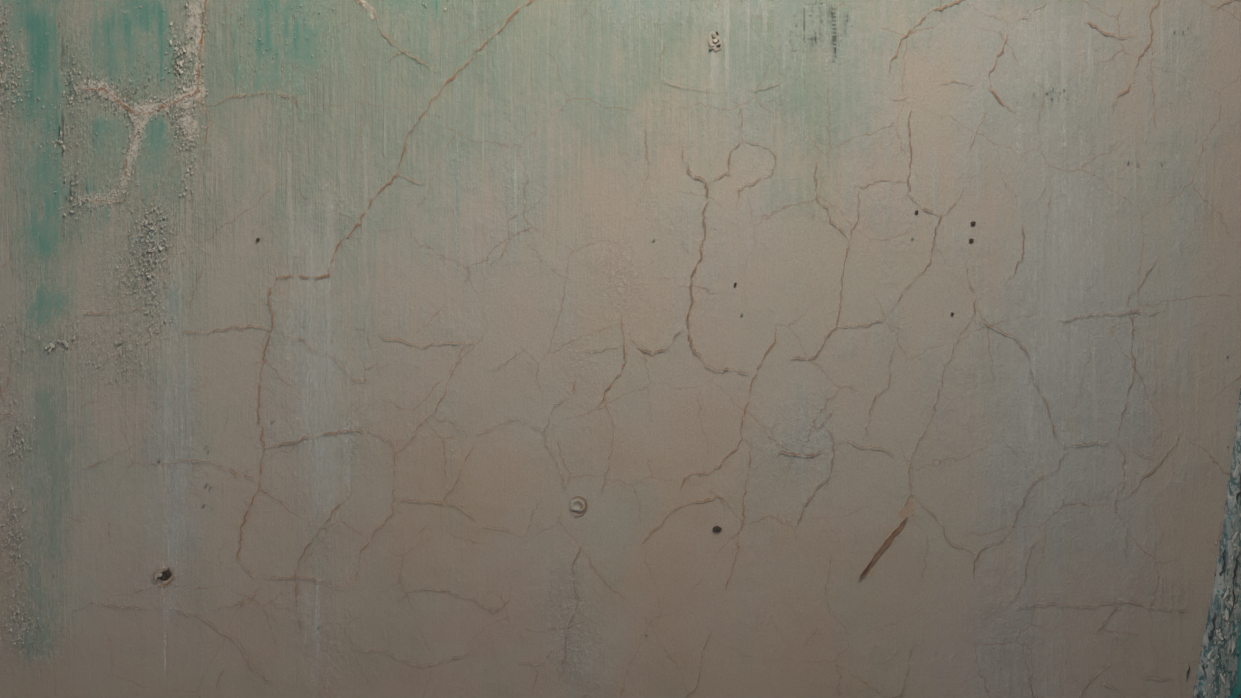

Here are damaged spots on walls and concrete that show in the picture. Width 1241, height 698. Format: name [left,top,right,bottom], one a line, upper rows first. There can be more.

crack [74,0,298,216]
crack [890,0,961,69]
crack [970,16,1027,147]
crack [1087,1,1159,121]
crack [156,0,575,685]
crack [595,97,1241,698]
peeling [1193,386,1241,698]